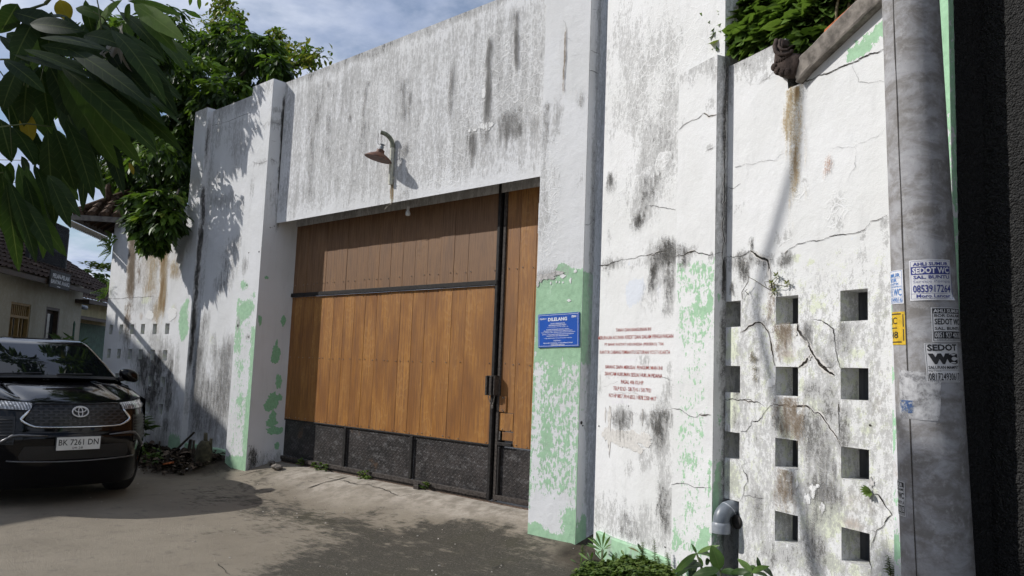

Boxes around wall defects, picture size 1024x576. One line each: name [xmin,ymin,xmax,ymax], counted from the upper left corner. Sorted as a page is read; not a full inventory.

damp [468,37,557,165]
damp [509,10,519,70]
crack [601,63,885,300]
corrosion [783,86,802,201]
crack [805,49,884,83]
damp [123,236,141,343]
damp [189,187,230,431]
flaking render [536,269,577,288]
damp [647,240,685,313]
peeling [263,339,283,450]
damp [644,406,673,450]
crack [869,494,892,566]